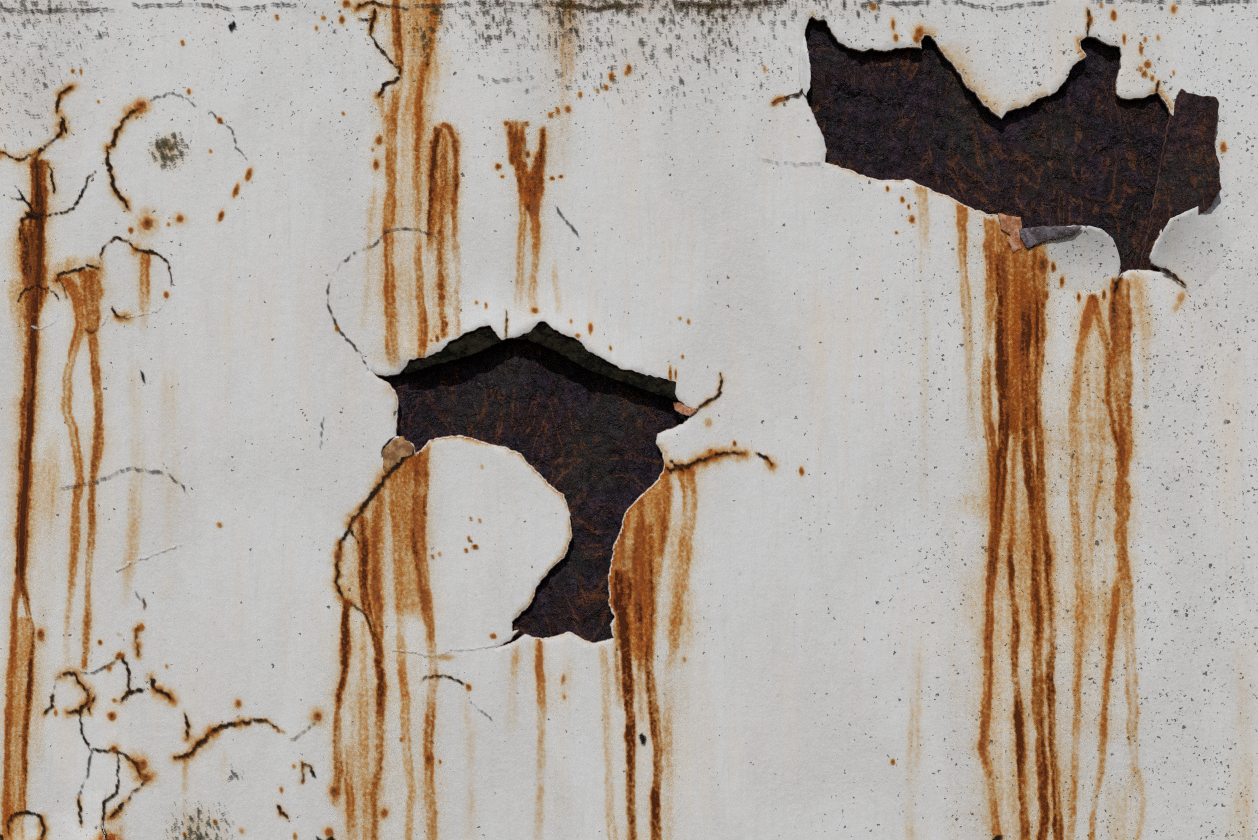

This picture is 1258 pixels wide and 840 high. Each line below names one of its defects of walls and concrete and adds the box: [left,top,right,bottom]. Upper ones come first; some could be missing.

crack [0,810,46,840]
corrosion [2,160,48,825]
crack [0,69,251,333]
crack [43,599,337,836]
corrosion [334,498,403,742]
crack [326,227,437,363]
corrosion [416,77,459,260]
peeling [378,322,697,645]
corrosion [611,468,694,840]
crack [695,373,723,410]
peeling [798,18,1222,275]
corrosion [978,234,1064,840]